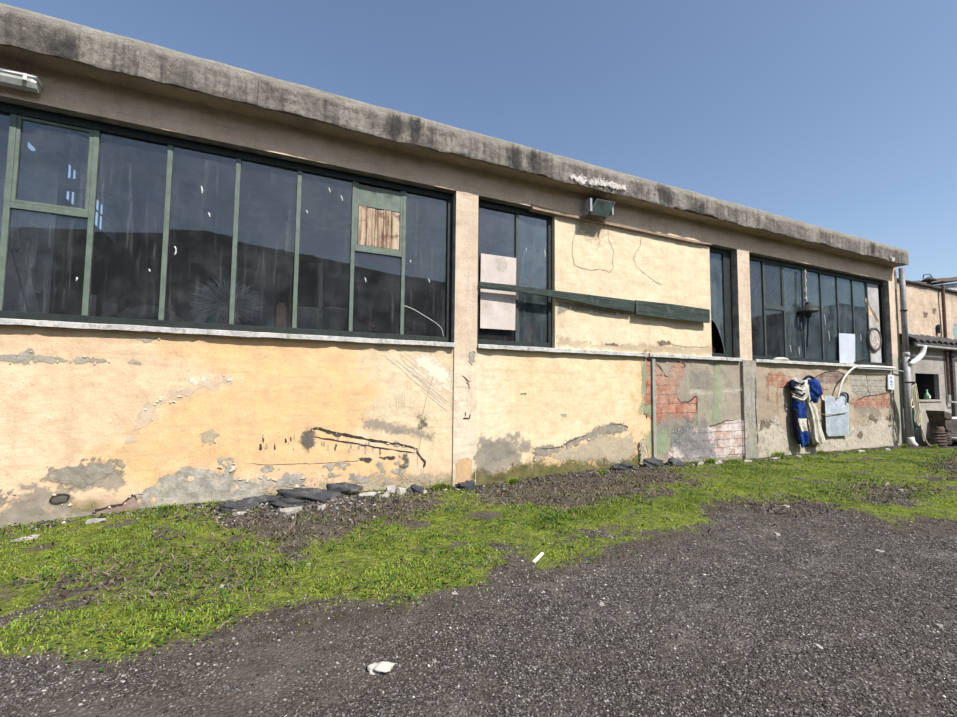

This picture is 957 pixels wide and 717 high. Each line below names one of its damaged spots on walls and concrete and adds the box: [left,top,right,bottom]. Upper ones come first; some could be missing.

damp [388,113,421,144]
damp [510,146,540,171]
damp [659,183,673,202]
crack [572,229,660,284]
peeling [0,348,110,364]
peeling [126,375,233,443]
flaking render [641,357,898,460]
flaking render [533,422,649,466]
crack [246,458,359,466]
spalling [49,494,70,505]